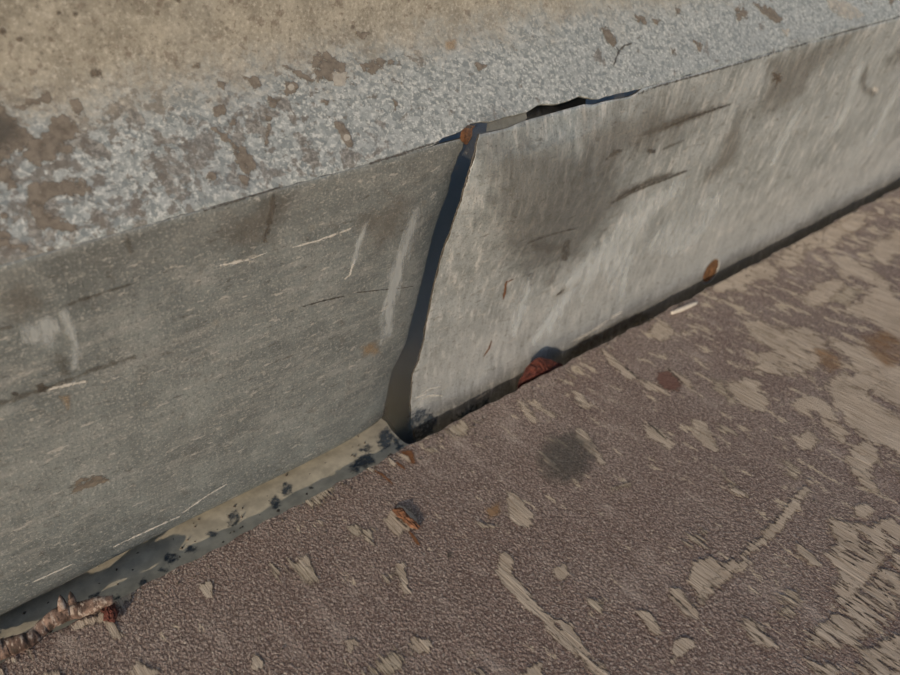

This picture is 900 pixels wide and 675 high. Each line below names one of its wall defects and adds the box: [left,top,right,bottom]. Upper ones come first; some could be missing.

crack [638,16,899,94]
crack [370,141,439,164]
corrosion [460,125,475,145]
crack [204,187,280,211]
corrosion [703,259,719,282]
peeling [711,196,900,347]
peeling [505,490,536,528]
peeling [709,319,900,675]
peeling [668,527,755,621]
peeling [494,552,613,675]
peeling [353,636,433,675]
peeling [670,637,696,666]